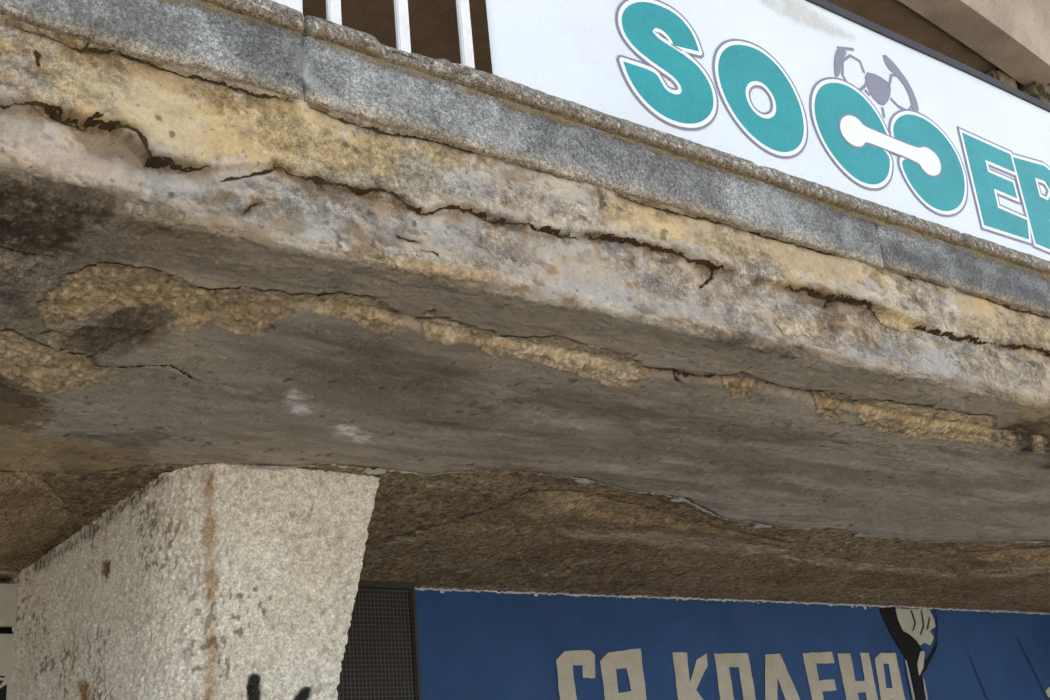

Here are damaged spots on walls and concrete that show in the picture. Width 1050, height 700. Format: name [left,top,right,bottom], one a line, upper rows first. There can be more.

crack [13,26,474,153]
crack [0,100,733,289]
crack [625,198,840,257]
spalling [0,263,653,396]
peeling [776,318,810,337]
crack [784,285,875,313]
crack [913,326,1050,357]
spalling [812,390,1050,454]
rust [78,683,89,700]